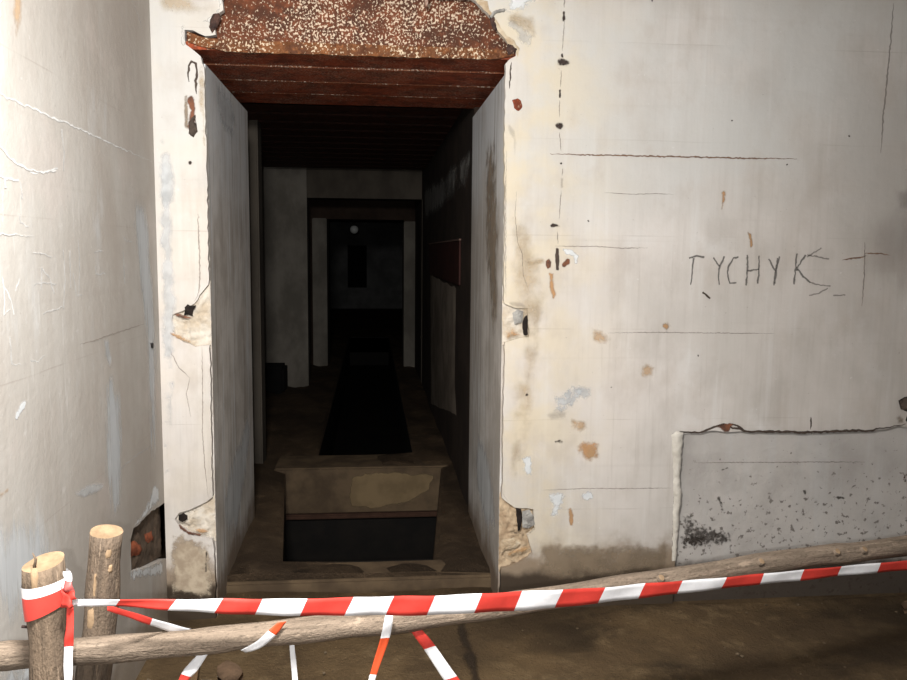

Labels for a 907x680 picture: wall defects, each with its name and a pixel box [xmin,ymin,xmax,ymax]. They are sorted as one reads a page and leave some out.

rust [187,31,514,89]
rust [184,61,198,137]
spalling [172,284,212,348]
spalling [502,300,529,345]
rust [580,443,597,459]
crack [679,418,905,434]
flaking render [131,486,162,580]
spalling [172,494,216,596]
spalling [498,492,535,571]
mould [683,516,731,545]